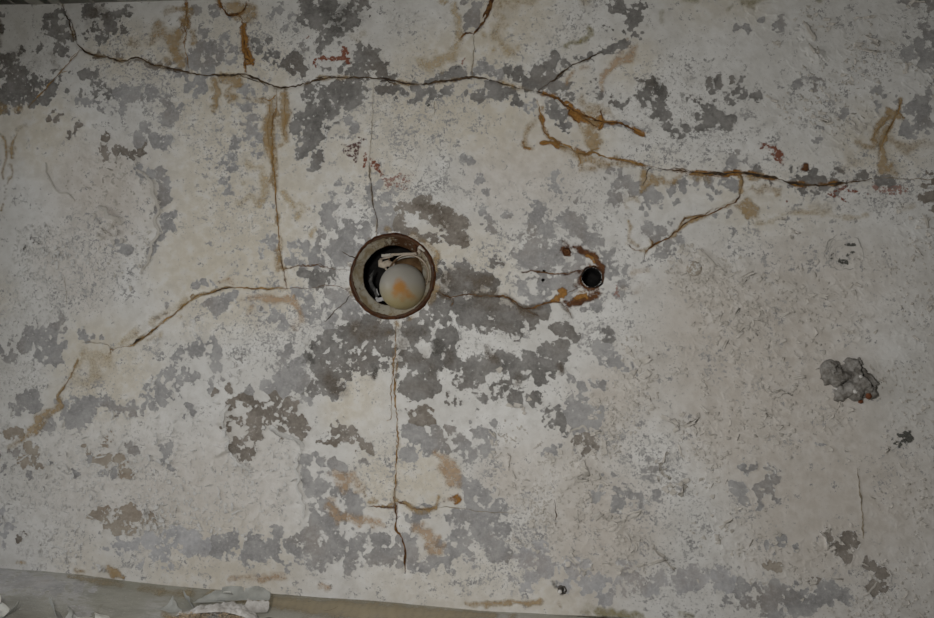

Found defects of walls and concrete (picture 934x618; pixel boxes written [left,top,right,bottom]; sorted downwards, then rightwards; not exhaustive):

flaking render [0,2,240,289]
water stain [152,7,197,68]
flaking render [204,77,271,196]
water stain [258,92,292,208]
crack [29,0,934,402]
corrosion [564,101,604,130]
flaking render [250,0,934,172]
corrosion [550,241,605,307]
flaking render [0,149,934,618]
crack [371,321,513,574]
crack [856,468,864,537]